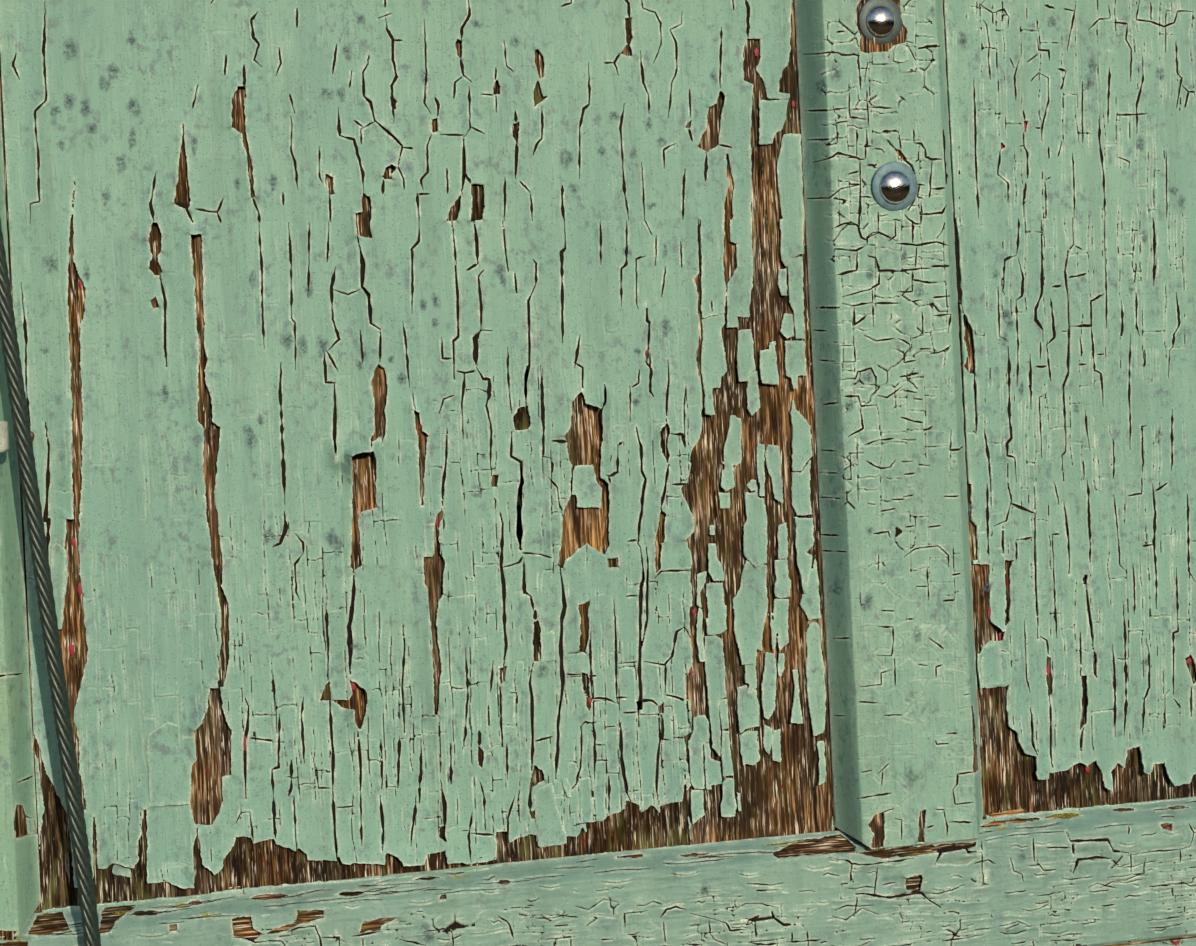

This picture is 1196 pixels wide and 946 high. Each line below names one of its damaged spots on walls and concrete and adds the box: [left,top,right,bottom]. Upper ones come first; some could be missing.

crack [12,2,48,221]
crack [719,0,750,88]
crack [149,0,732,862]
peeling [51,2,965,931]
crack [803,0,1196,759]
peeling [967,481,1196,848]
peeling [0,730,83,945]
crack [90,758,168,881]
crack [234,763,1196,946]
peeling [1001,901,1082,936]
peeling [1063,861,1155,901]